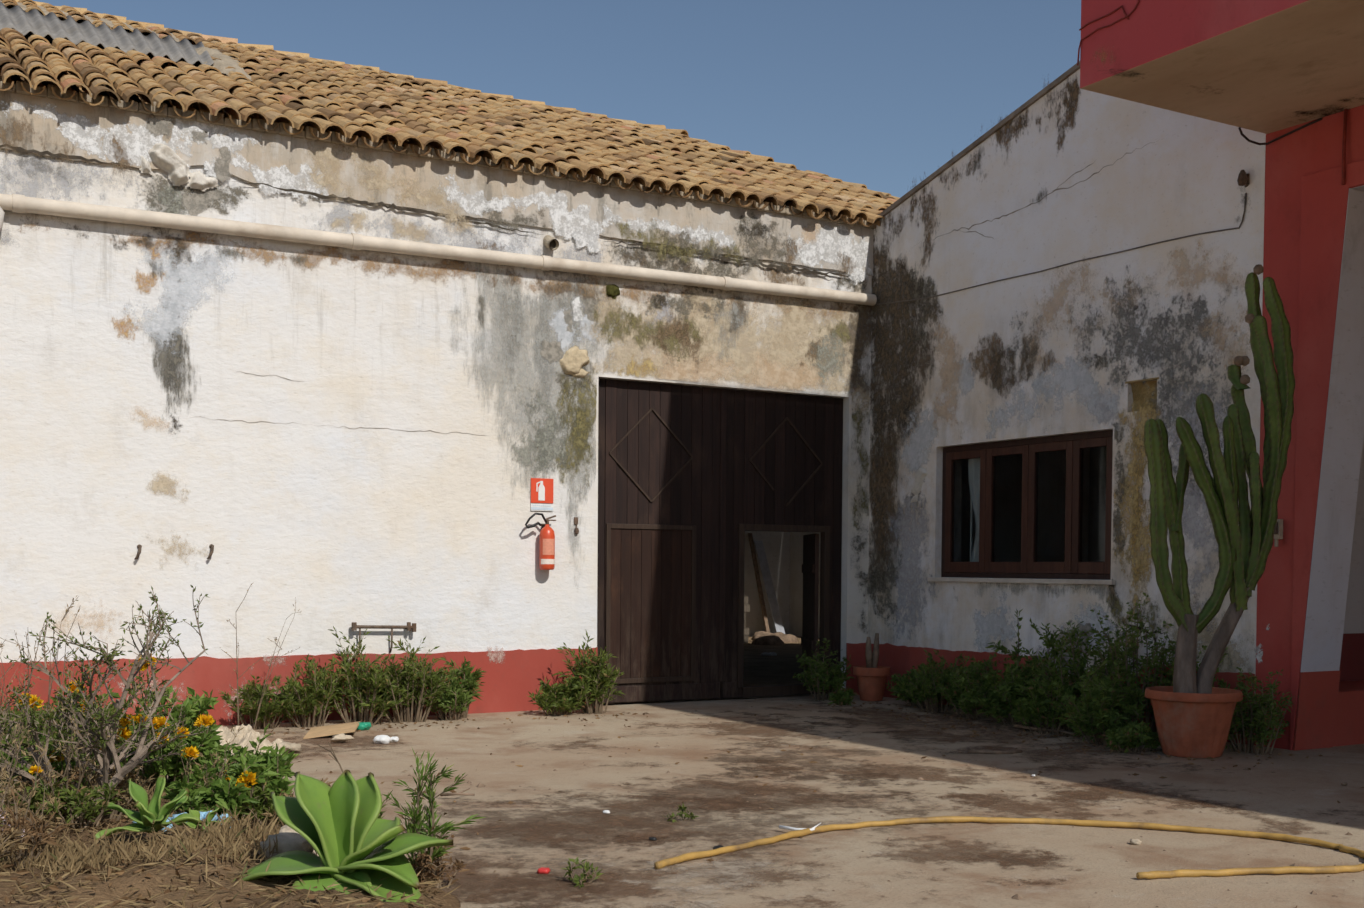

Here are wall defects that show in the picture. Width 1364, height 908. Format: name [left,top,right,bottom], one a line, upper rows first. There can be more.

crack [0,144,137,168]
water stain [112,232,192,281]
peeling [0,99,329,216]
crack [232,181,543,235]
crack [908,143,1149,250]
water stain [995,77,1080,150]
water stain [151,304,192,405]
water stain [308,140,1245,652]